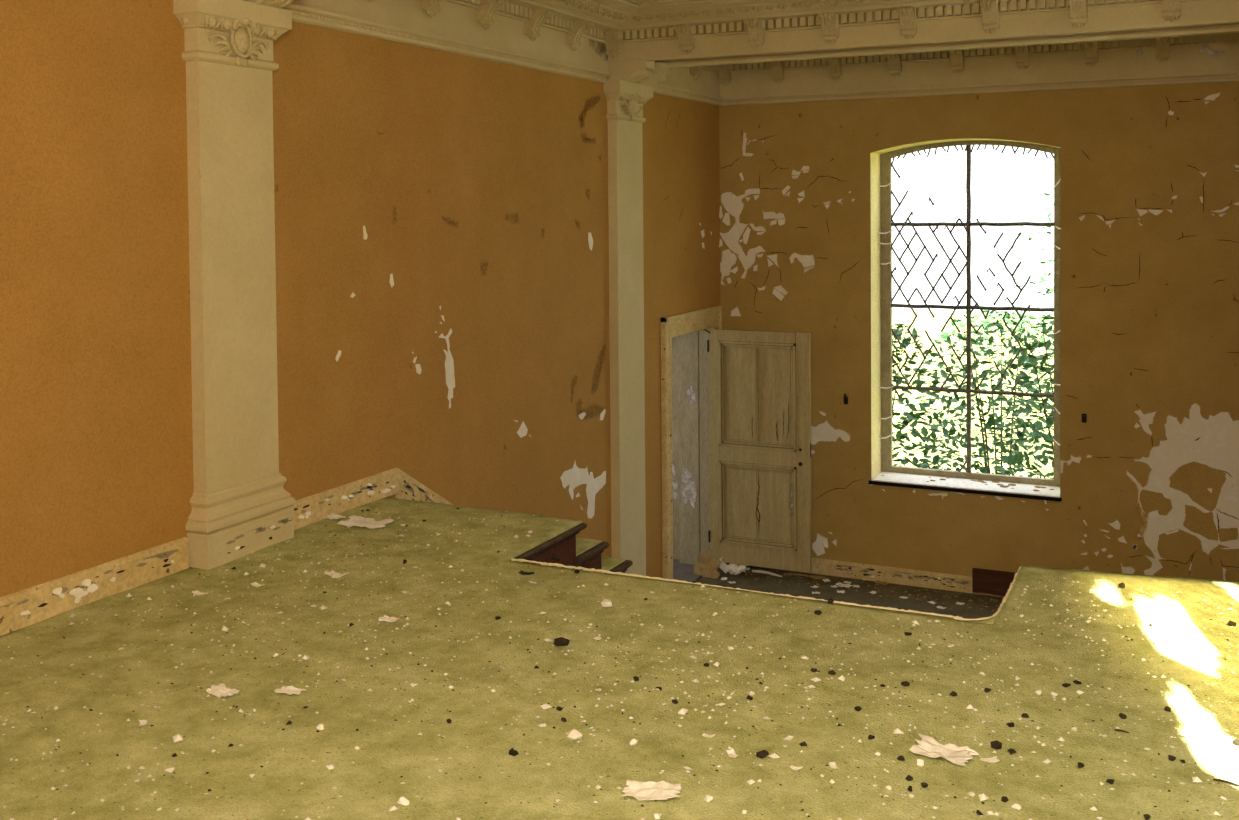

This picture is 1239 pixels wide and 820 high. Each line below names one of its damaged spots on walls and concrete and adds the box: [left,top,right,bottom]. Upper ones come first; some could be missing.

peeling [699,165,816,300]
crack [724,129,860,313]
crack [1080,249,1140,291]
crack [1079,165,1232,241]
peeling [1136,196,1177,225]
peeling [434,306,455,408]
peeling [226,476,444,554]
peeling [560,461,606,519]
peeling [811,410,851,455]
peeling [1060,454,1093,474]
peeling [1079,402,1239,576]
peeling [2,549,179,615]